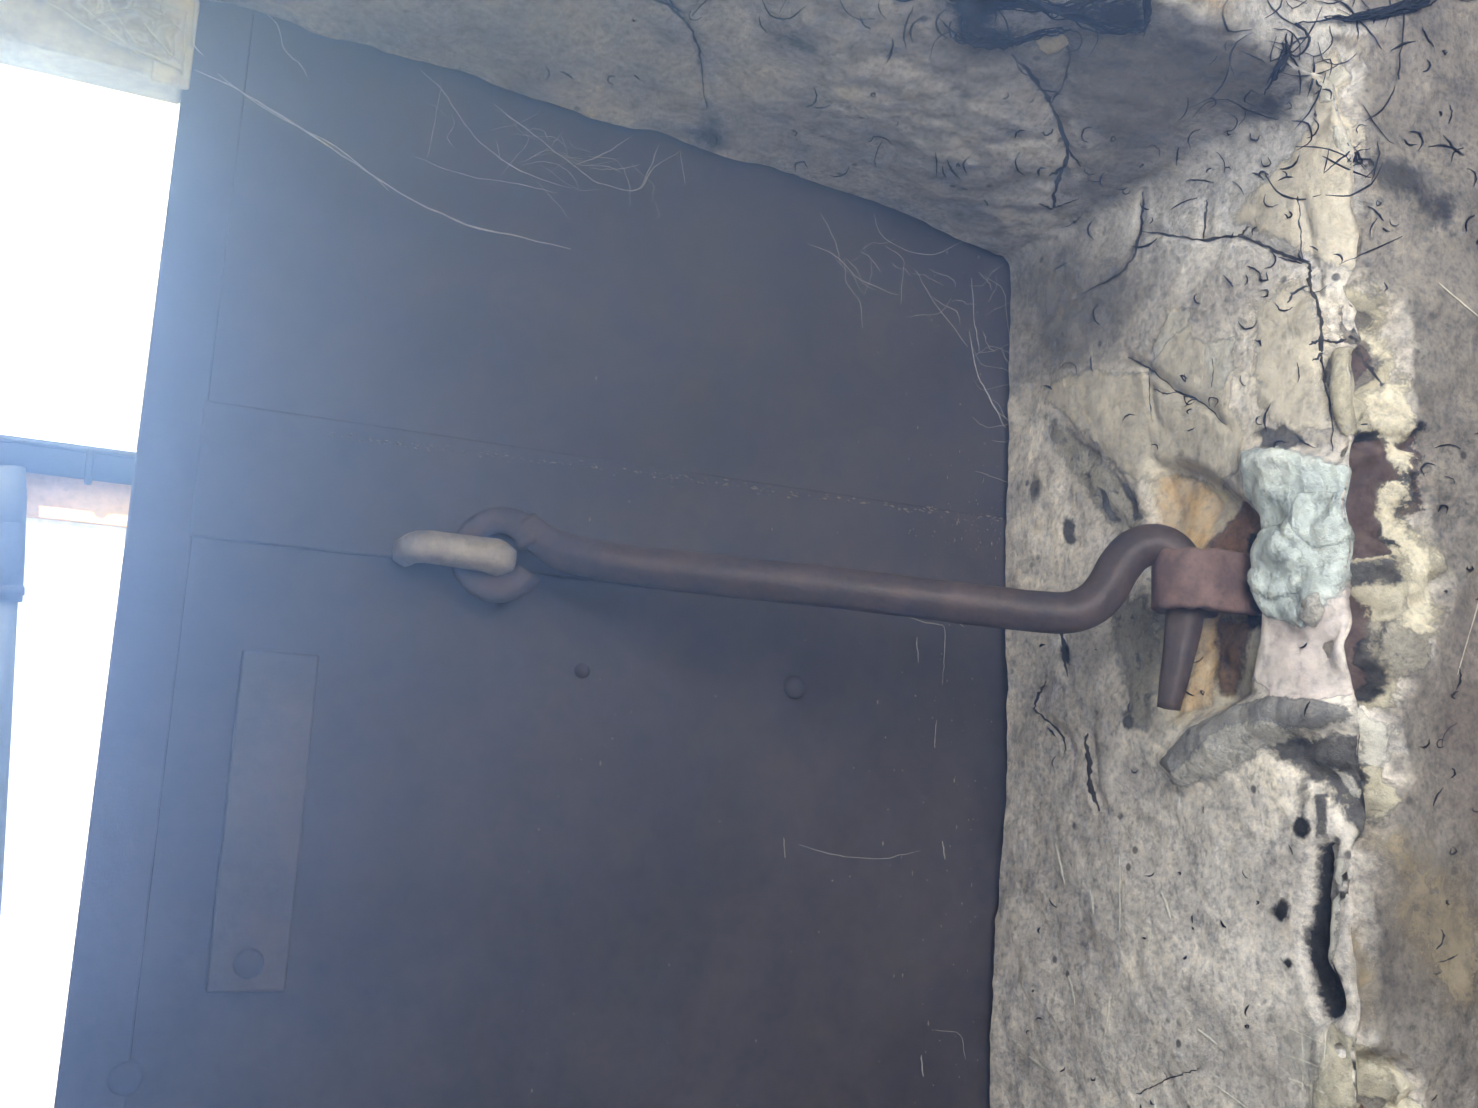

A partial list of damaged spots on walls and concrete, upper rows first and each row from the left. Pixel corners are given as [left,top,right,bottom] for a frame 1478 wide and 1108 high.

crack [653,0,708,110]
crack [1011,45,1081,210]
crack [1078,191,1385,451]
peeling [1044,307,1245,532]
spalling [1169,49,1448,839]
spalling [1063,519,1076,544]
rust [1158,473,1261,554]
spalling [1111,595,1163,731]
rust [1167,612,1262,720]
spalling [1272,898,1289,922]
peeling [1328,857,1344,970]
spalling [1288,1022,1423,1108]